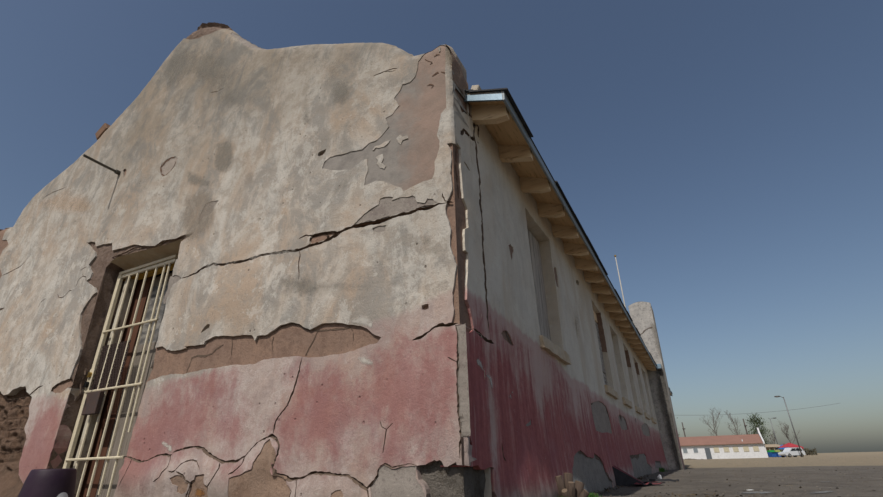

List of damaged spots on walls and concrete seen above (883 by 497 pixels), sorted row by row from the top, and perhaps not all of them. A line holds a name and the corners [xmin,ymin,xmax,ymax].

flaking render [320,46,471,332]
crack [180,194,453,279]
crack [413,112,494,455]
flaking render [145,323,381,384]
crack [119,359,417,497]
spalling [420,437,486,497]
peeling [572,451,612,493]